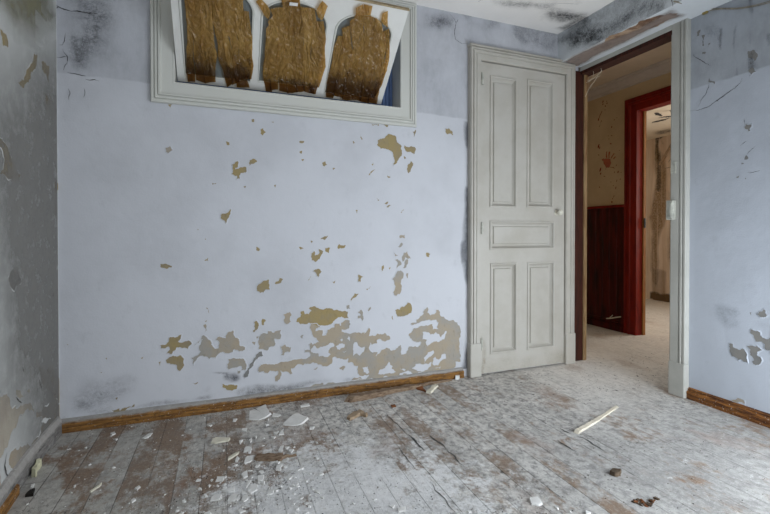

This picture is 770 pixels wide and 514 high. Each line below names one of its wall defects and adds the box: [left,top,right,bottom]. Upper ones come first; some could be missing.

water stain [551,13,600,44]
peeling [372,124,416,173]
peeling [256,278,283,294]
peeling [299,236,346,278]
peeling [382,235,410,297]
peeling [159,294,462,392]
peeling [728,328,770,366]
peeling [0,386,60,470]